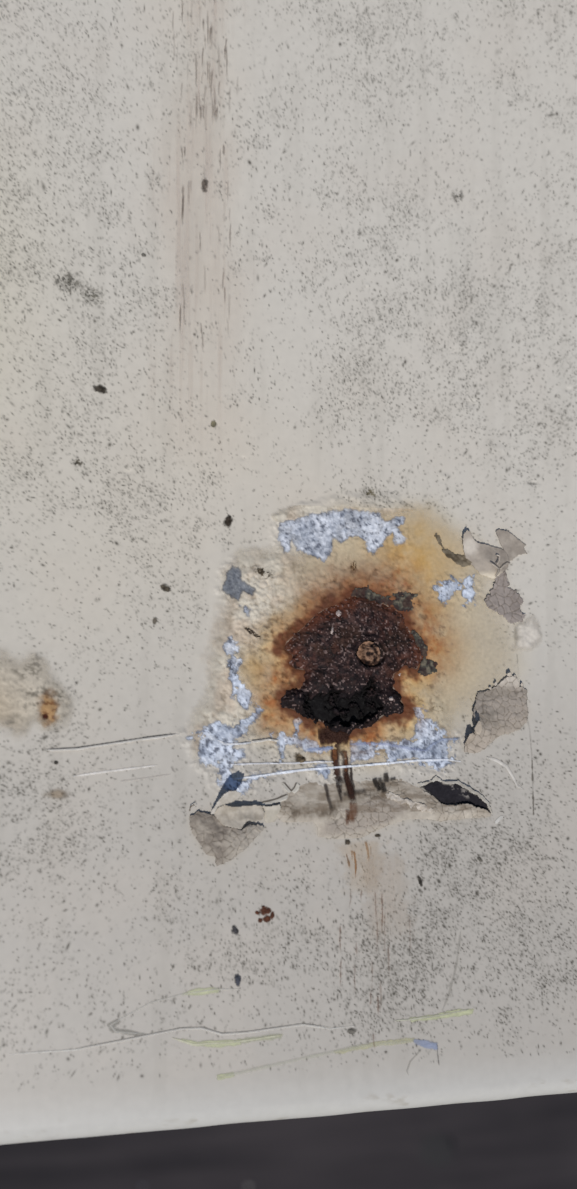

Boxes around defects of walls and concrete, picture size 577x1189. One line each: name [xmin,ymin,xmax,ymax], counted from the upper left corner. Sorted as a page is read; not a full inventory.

peeling [277,508,406,562]
peeling [222,566,256,616]
peeling [351,585,418,612]
peeling [433,529,527,624]
corrosion [243,517,501,823]
corrosion [41,695,57,724]
peeling [186,630,529,866]
corrosion [255,906,274,923]